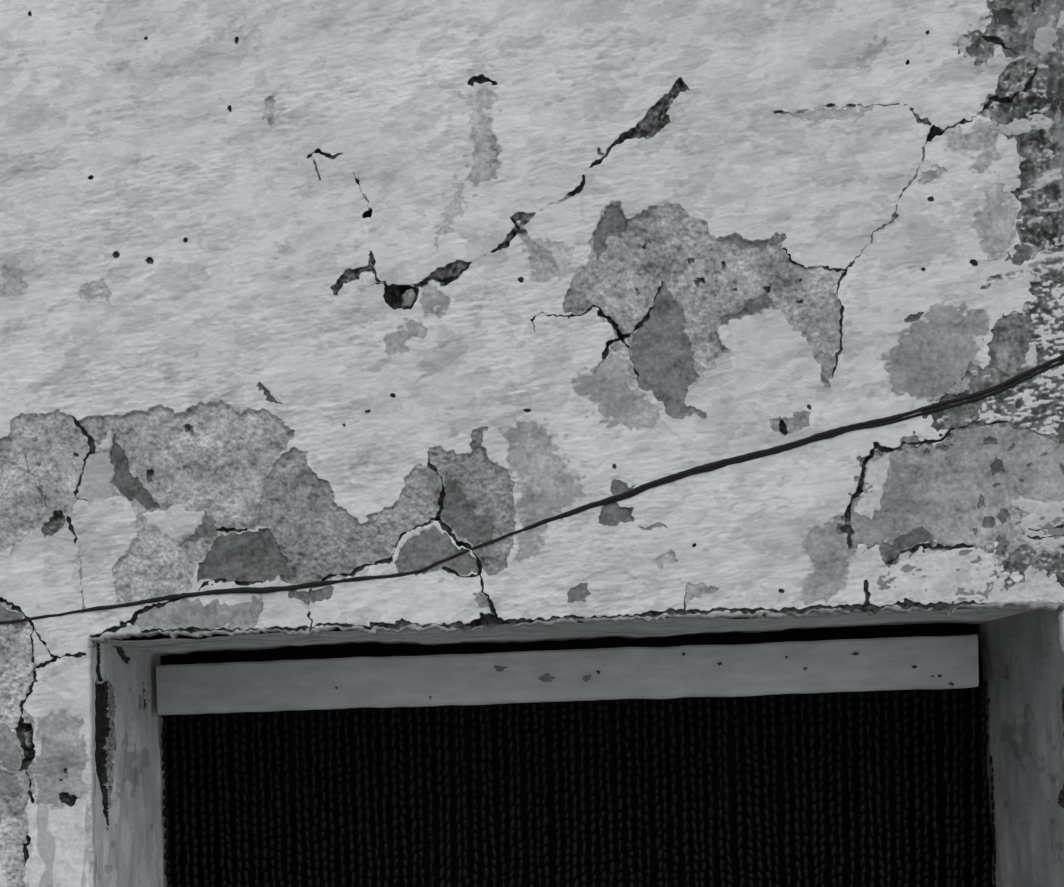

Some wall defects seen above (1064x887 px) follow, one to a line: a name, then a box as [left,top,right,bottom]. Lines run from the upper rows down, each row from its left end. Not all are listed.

crack [307,149,372,218]
crack [484,78,690,256]
crack [531,281,663,381]
flaking render [563,200,845,430]
crack [773,100,993,379]
flaking render [791,0,1064,605]
crack [23,835,31,869]
flaking render [0,599,93,887]
flaking render [0,381,586,630]
crack [0,452,996,831]
peeling [567,583,591,603]
crack [839,420,1009,548]